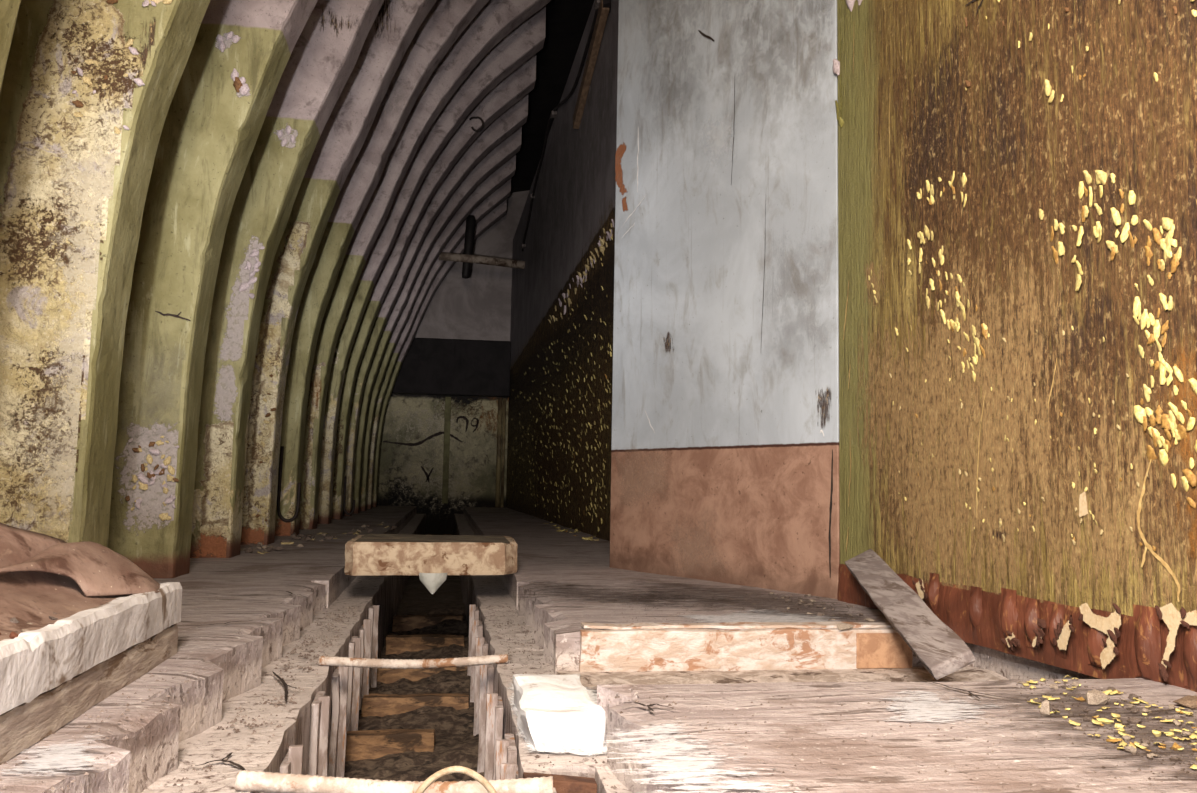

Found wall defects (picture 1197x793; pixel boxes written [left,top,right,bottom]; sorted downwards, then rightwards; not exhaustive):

peeling [0,0,145,543]
peeling [114,422,179,536]
peeling [199,221,311,533]
peeling [857,0,1197,681]
leakage [883,0,1197,469]